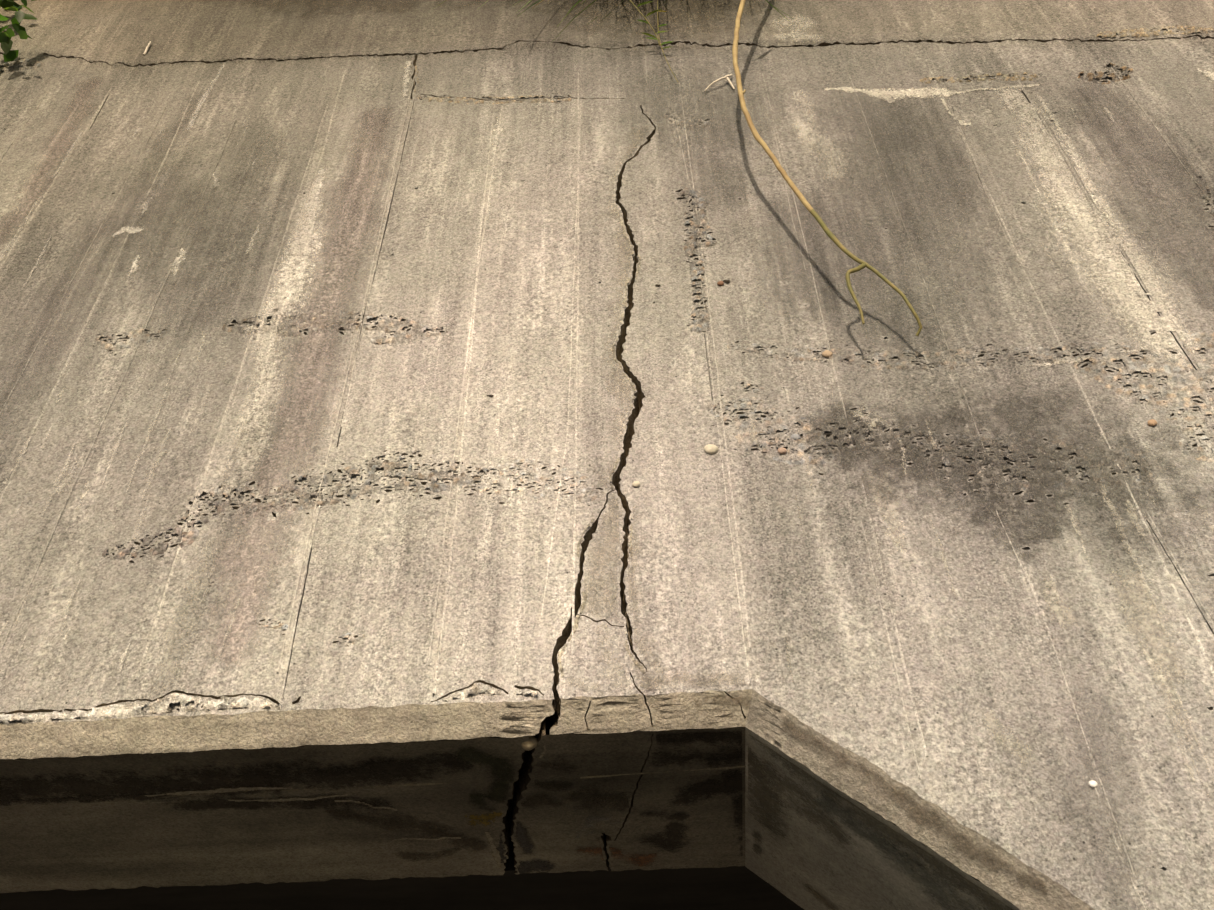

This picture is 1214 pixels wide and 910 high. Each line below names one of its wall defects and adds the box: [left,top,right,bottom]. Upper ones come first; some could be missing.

crack [43,34,1214,102]
crack [431,105,656,873]
water stain [807,392,1213,559]
spalling [0,693,283,725]